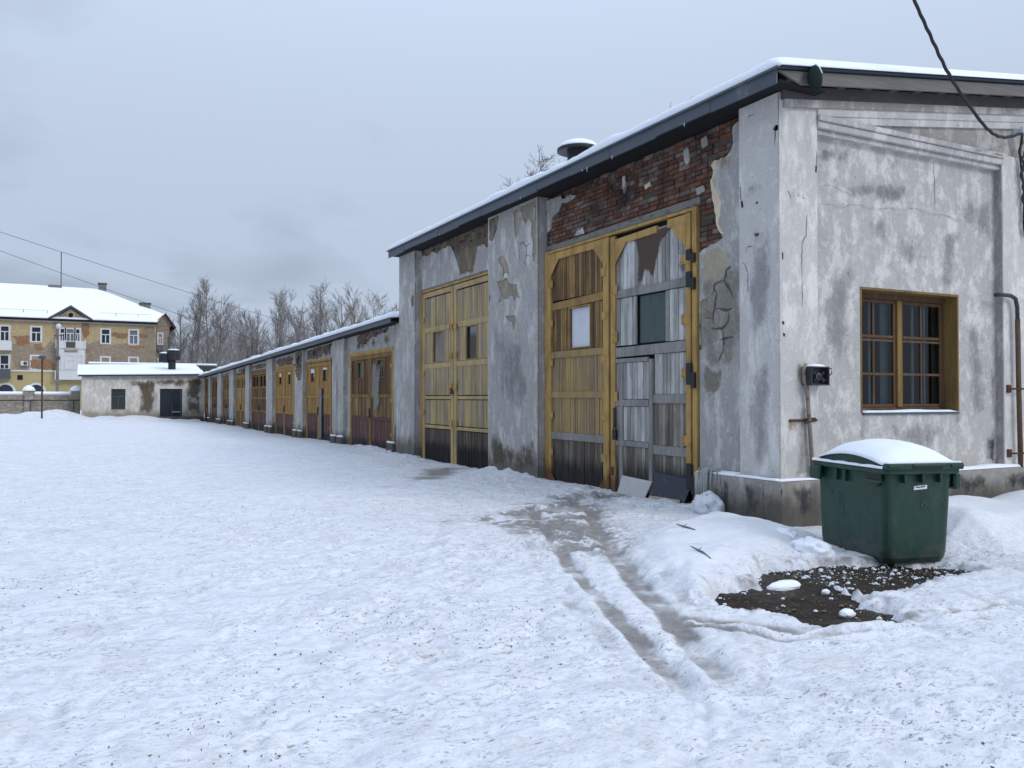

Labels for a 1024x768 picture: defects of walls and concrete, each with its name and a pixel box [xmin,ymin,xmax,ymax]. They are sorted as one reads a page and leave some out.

spalling [514,117,739,260]
spalling [422,216,499,274]
spalling [498,257,520,302]
crack [711,246,753,362]
leakage [139,379,201,413]